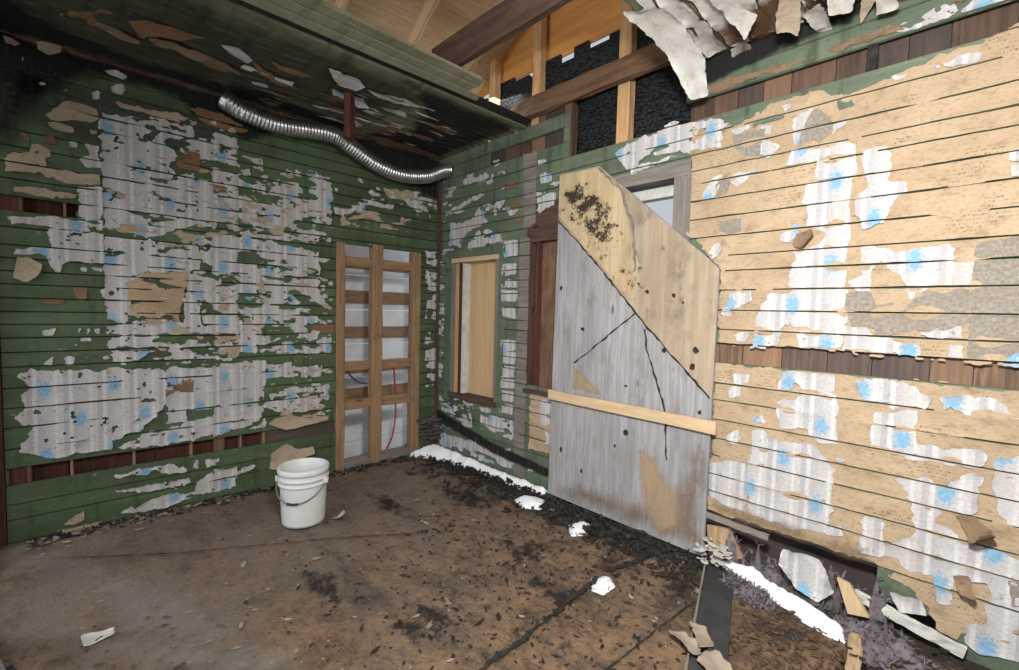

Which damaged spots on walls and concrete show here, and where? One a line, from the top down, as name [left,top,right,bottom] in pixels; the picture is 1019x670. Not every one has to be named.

peeling [59,9,456,159]
peeling [631,123,772,175]
peeling [793,100,854,146]
peeling [760,146,960,311]
peeling [4,107,348,437]
peeling [972,236,1019,285]
peeling [733,332,749,346]
peeling [796,326,872,351]
peeling [915,315,1019,367]
peeling [114,458,219,493]
peeling [707,362,1019,634]
peeling [693,536,733,571]